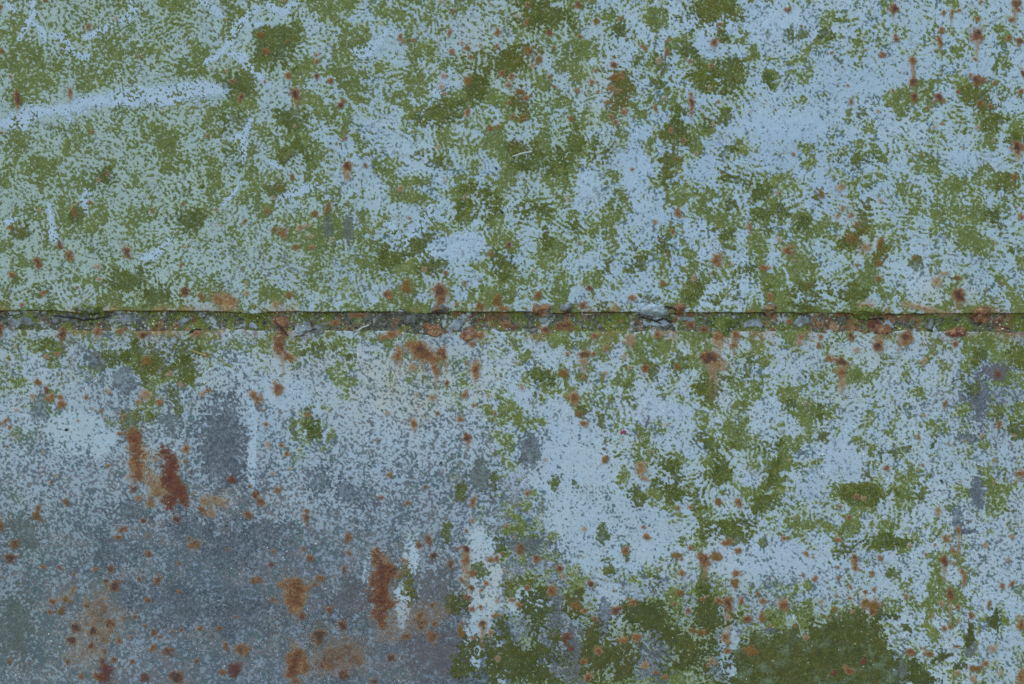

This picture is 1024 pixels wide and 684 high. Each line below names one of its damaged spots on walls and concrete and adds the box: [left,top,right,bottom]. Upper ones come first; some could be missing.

crack [52,313,109,321]
rust [377,330,449,415]
crack [641,305,677,324]
rust [673,309,741,389]
rust [117,414,227,538]
rust [271,575,325,620]
rust [366,547,448,645]